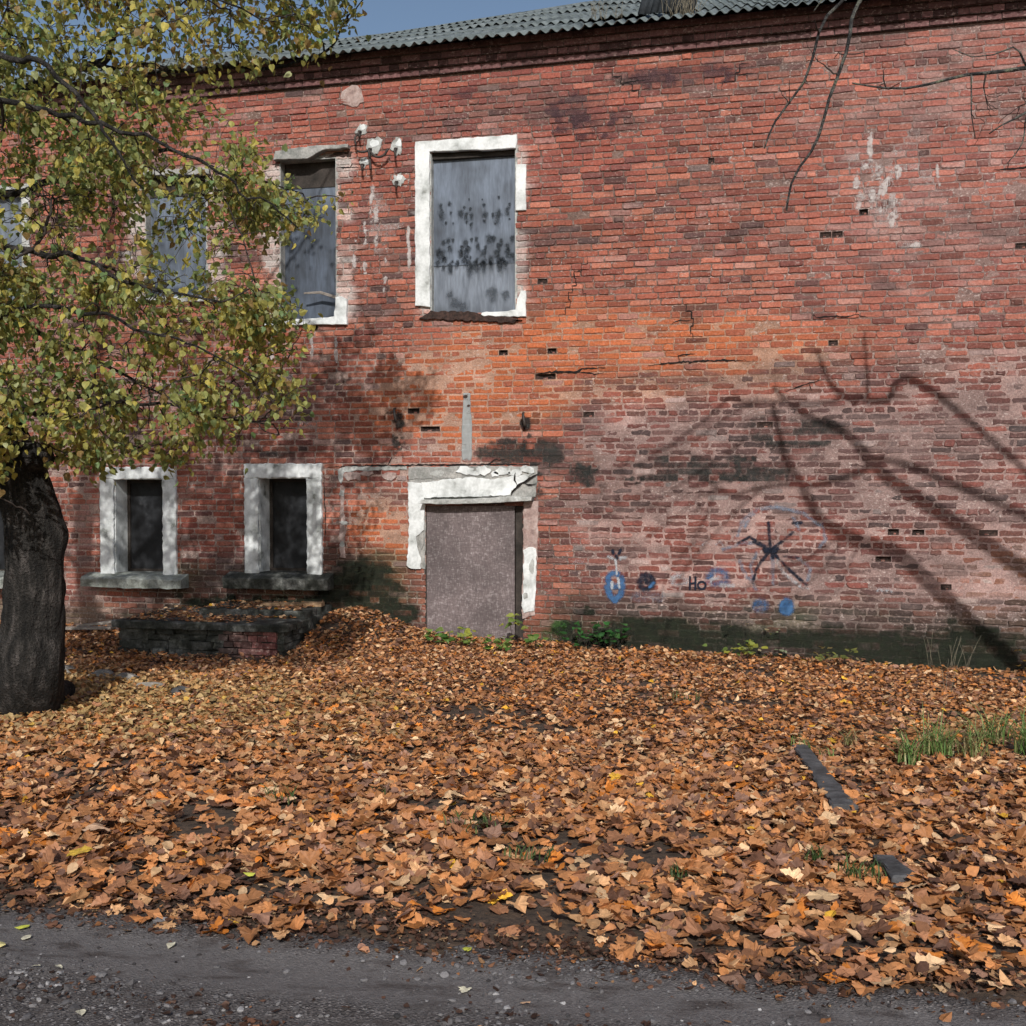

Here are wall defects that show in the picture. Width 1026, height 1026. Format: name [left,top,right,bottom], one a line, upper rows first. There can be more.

leakage [853,132,902,226]
crack [559,257,588,321]
crack [648,304,743,366]
leakage [729,455,756,481]
peeling [338,465,534,569]